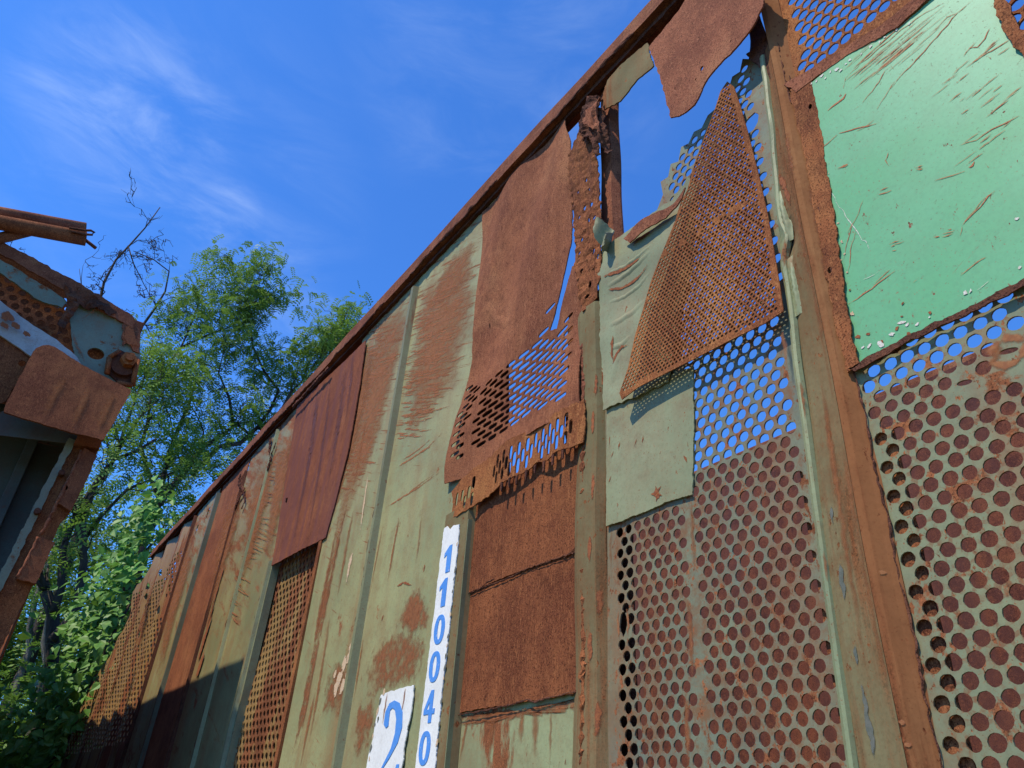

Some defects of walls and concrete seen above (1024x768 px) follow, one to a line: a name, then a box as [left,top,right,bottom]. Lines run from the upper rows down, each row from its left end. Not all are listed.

corrosion [624,188,686,243]
corrosion [0,311,31,337]
corrosion [778,0,1024,768]
corrosion [196,95,645,765]
peeling [333,644,351,697]